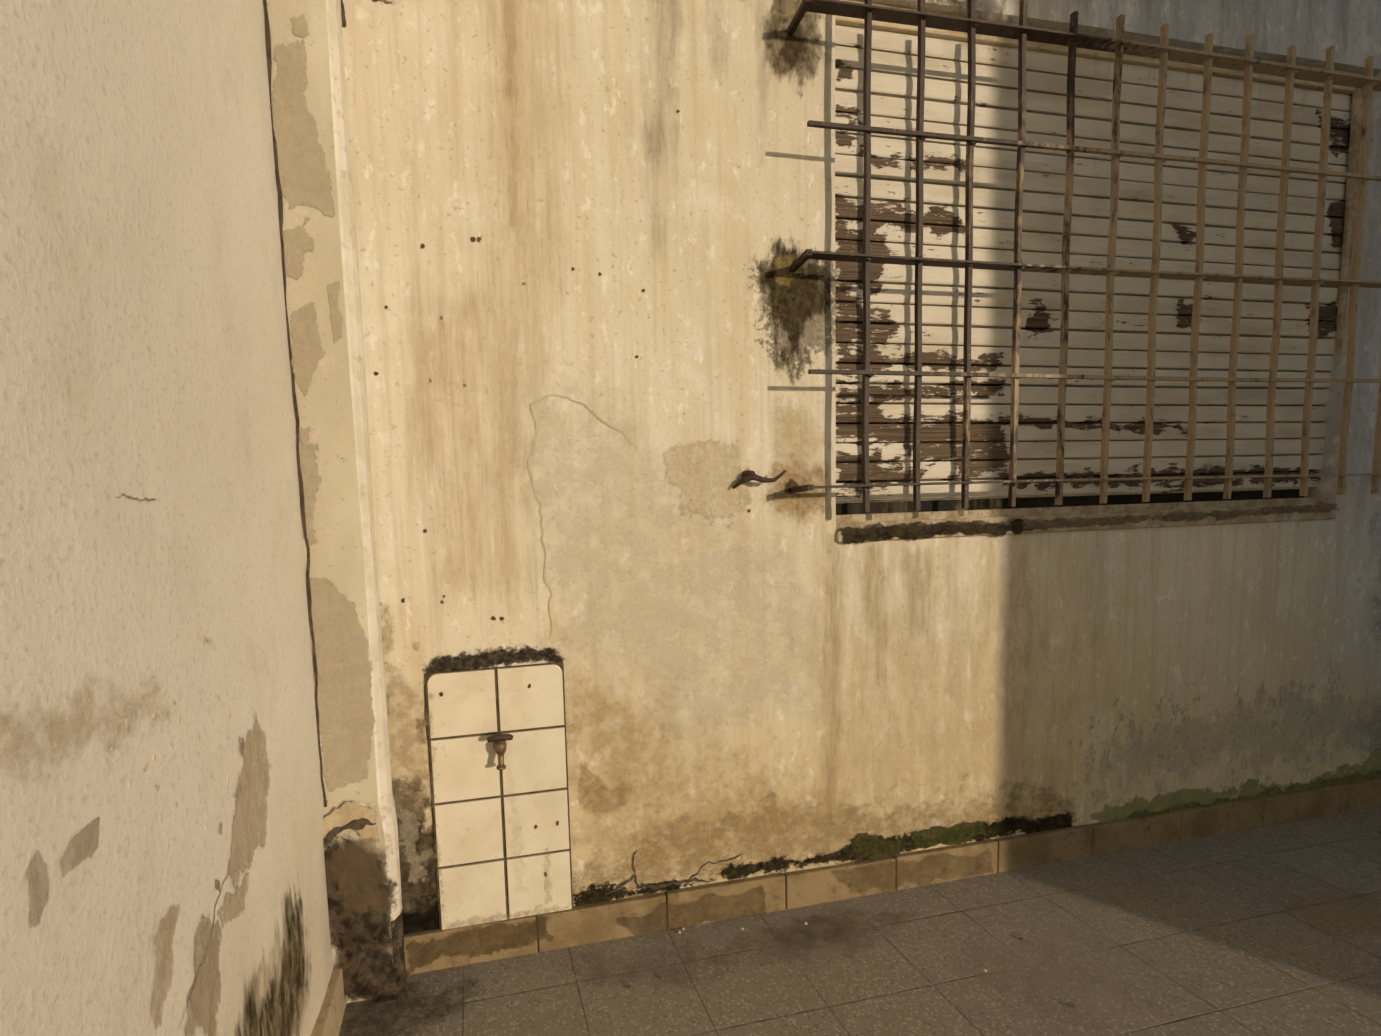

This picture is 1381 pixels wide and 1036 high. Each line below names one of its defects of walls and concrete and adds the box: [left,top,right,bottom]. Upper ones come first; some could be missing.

damp [766,0,827,85]
damp [760,239,837,372]
rust [772,463,824,517]
peeling [309,577,379,848]
peeling [72,818,100,869]
peeling [185,713,270,1036]
damp [239,889,311,1036]
damp [324,775,440,1005]
damp [570,703,1074,907]